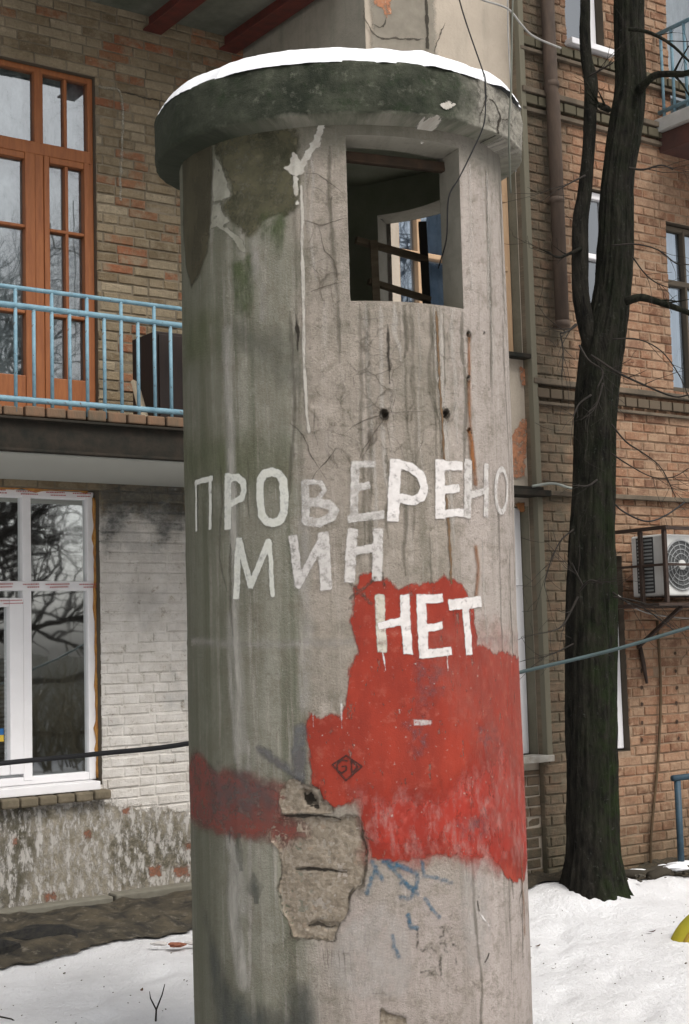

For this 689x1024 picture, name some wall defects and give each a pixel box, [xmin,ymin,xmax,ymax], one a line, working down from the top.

peeling [210,157,246,252]
damp [182,129,301,286]
crack [307,218,346,291]
damp [229,449,237,550]
crack [290,320,395,468]
crack [435,311,453,584]
rust [467,337,477,485]
flaking render [512,419,527,478]
damp [231,599,242,751]
peeling [0,797,191,908]
damp [228,827,247,987]
spalling [271,779,373,942]